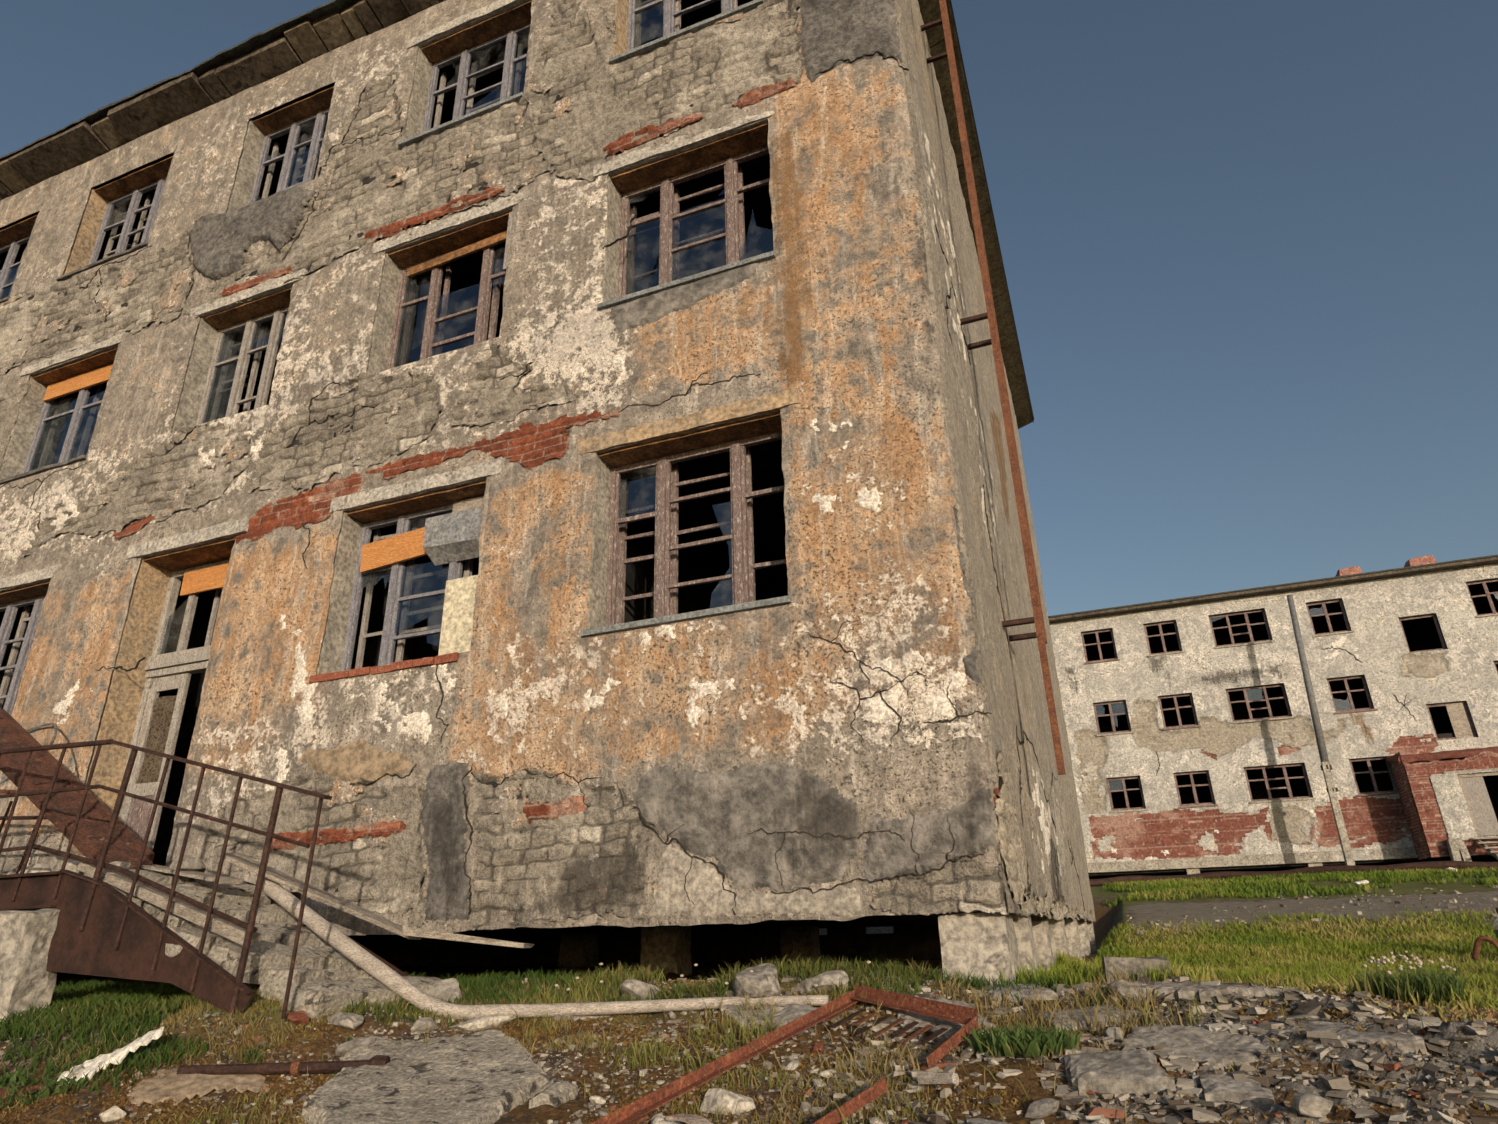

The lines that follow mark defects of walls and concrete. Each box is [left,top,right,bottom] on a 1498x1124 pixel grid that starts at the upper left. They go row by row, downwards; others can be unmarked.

spalling [0,0,805,377]
spalling [9,343,633,557]
crack [621,372,761,411]
peeling [855,486,883,513]
crack [357,665,449,785]
crack [461,767,601,920]
spalling [467,769,652,931]
crack [633,806,984,915]
crack [805,621,1085,911]
spalling [870,751,1095,922]
spalling [1130,699,1346,760]
flaking render [1075,729,1412,861]